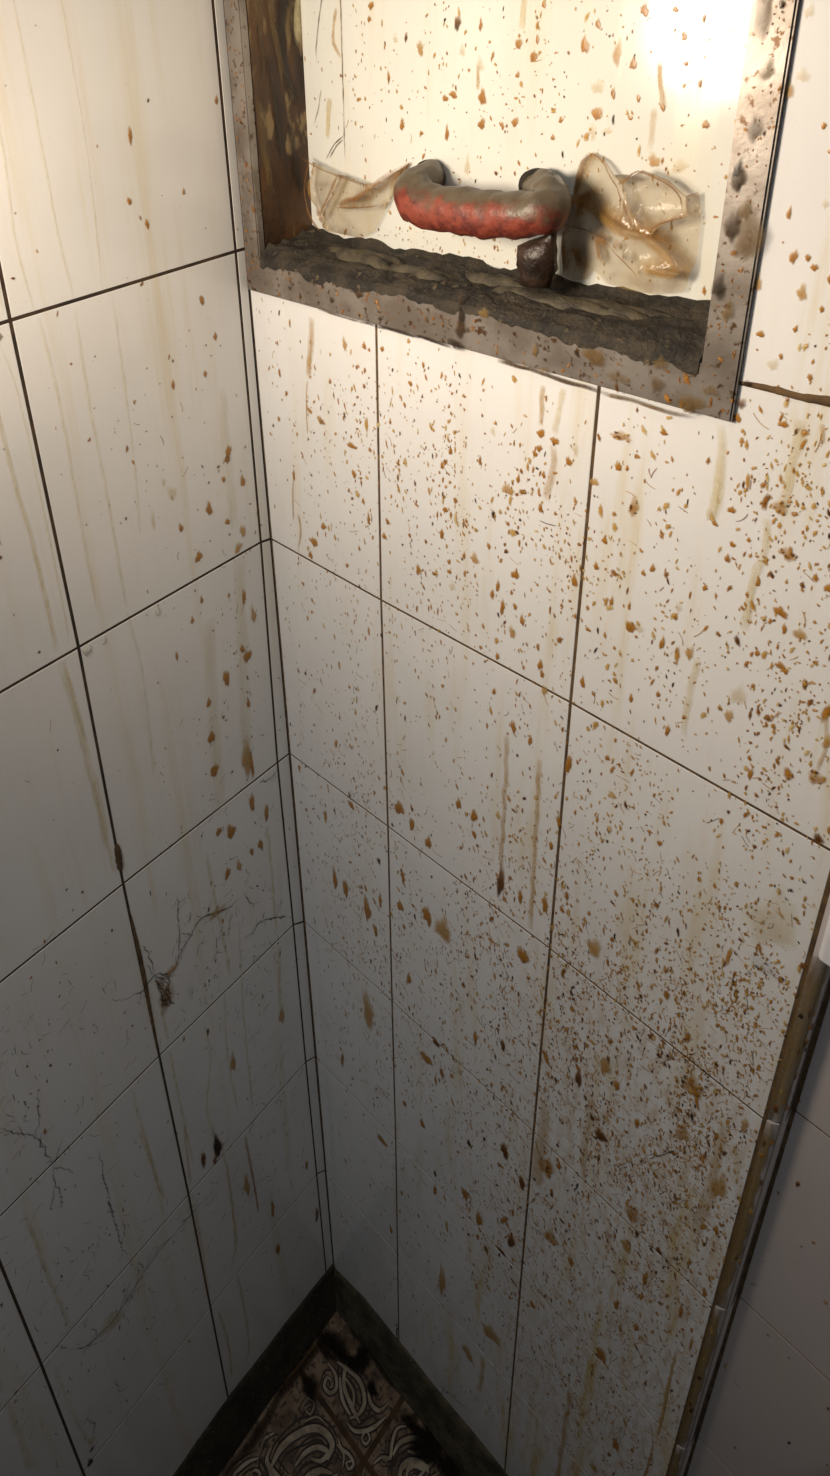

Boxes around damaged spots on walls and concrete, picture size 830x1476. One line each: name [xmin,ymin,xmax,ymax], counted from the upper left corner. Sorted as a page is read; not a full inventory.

corrosion [672,6,720,88]
corrosion [733,0,793,97]
corrosion [238,108,830,1476]
crack [114,897,285,1008]